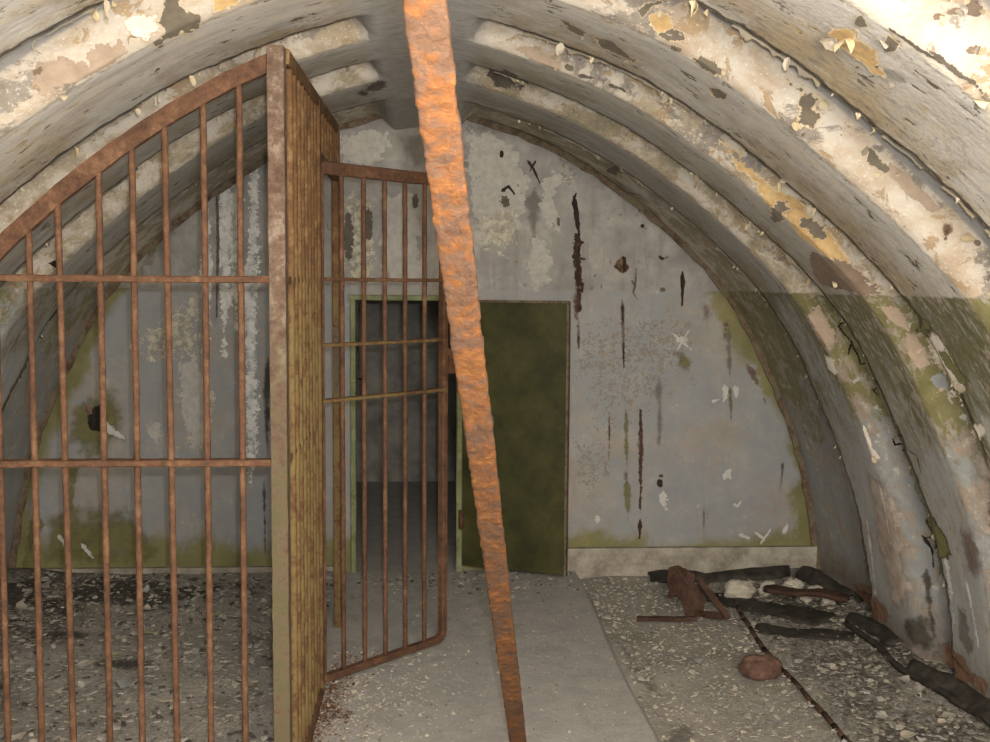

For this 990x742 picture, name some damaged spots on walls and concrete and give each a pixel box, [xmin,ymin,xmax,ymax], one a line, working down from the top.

peeling [50,89,167,166]
peeling [30,0,239,101]
peeling [637,0,728,100]
peeling [732,24,834,131]
peeling [819,14,906,88]
peeling [933,0,986,26]
peeling [966,45,981,55]
peeling [974,92,990,109]
peeling [14,165,144,274]
peeling [941,186,976,219]